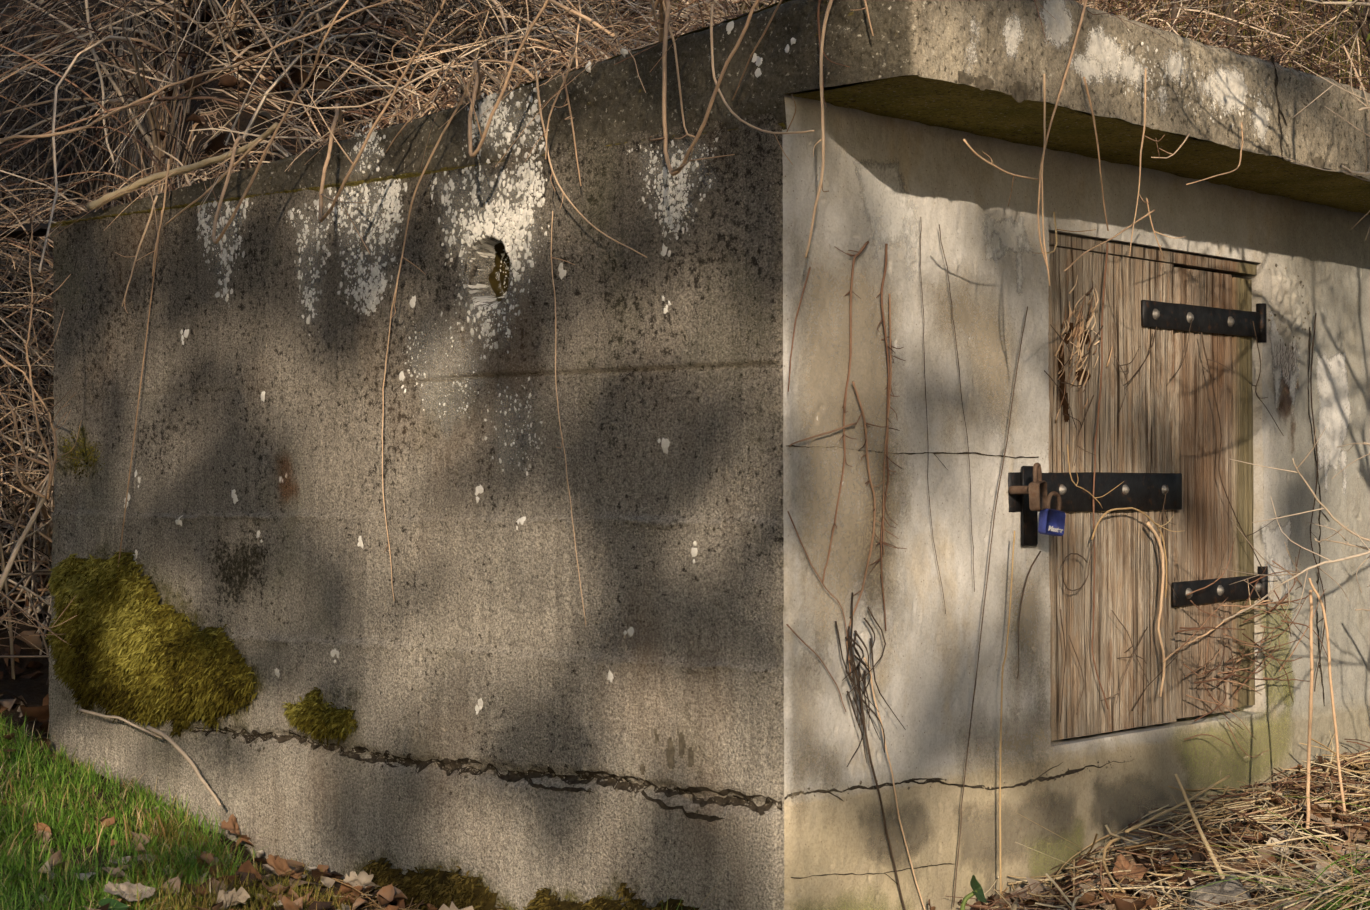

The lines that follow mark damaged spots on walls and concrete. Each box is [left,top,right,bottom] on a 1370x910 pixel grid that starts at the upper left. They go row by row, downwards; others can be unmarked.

leakage [196,197,253,304]
leakage [285,122,408,336]
leakage [208,522,275,621]
crack [191,724,1131,822]